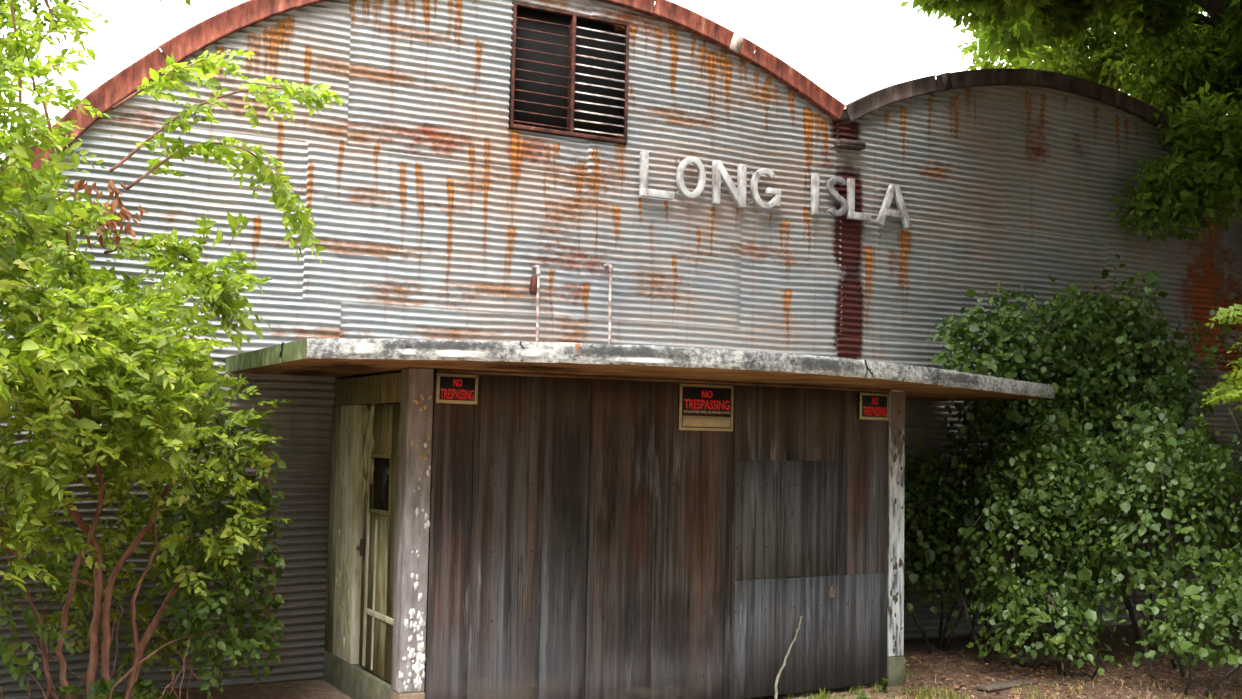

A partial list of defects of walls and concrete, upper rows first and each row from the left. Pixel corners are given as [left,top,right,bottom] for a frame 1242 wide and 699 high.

corrosion [304,47,411,90]
corrosion [350,0,475,45]
corrosion [253,216,261,260]
corrosion [318,122,490,286]
corrosion [508,129,625,238]
corrosion [541,247,599,310]
corrosion [605,12,880,360]
corrosion [1183,217,1242,385]
peeling [408,392,432,492]
peeling [890,391,905,509]
peeling [398,573,426,692]
peeling [889,558,902,654]